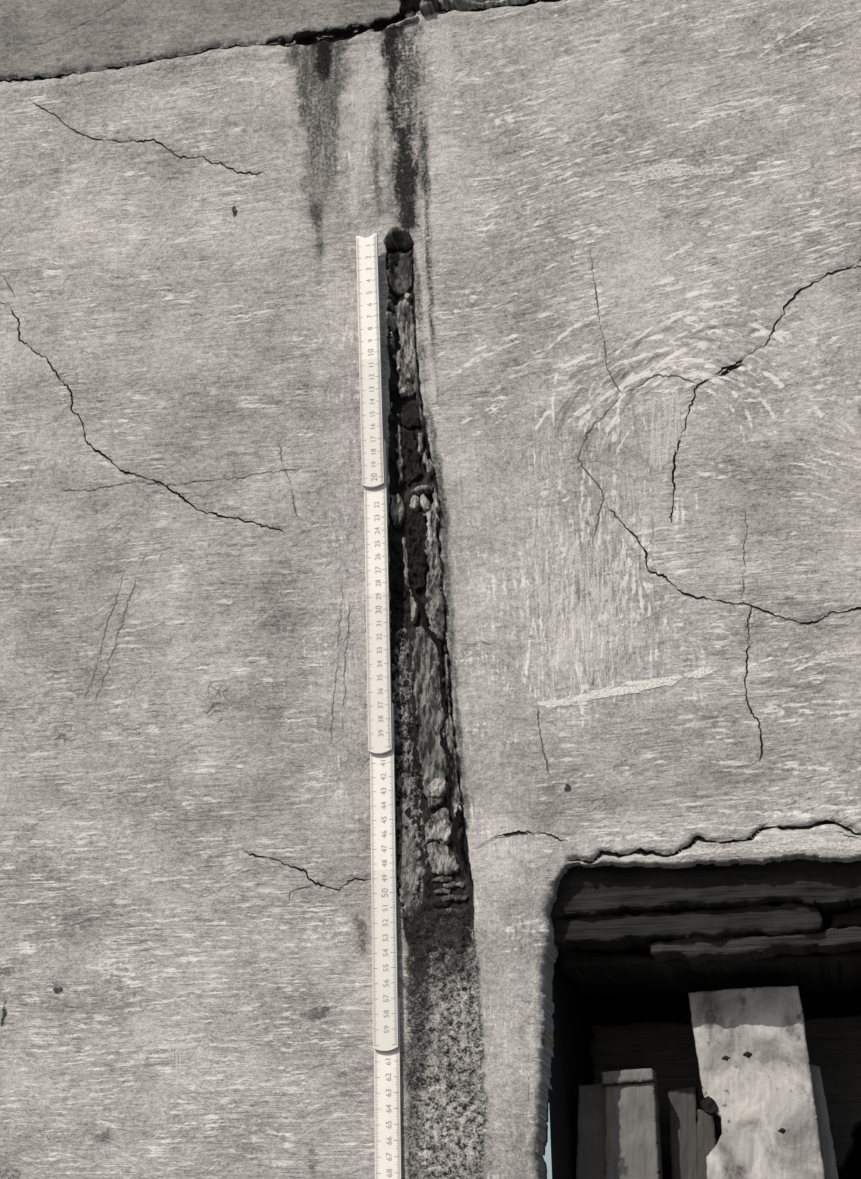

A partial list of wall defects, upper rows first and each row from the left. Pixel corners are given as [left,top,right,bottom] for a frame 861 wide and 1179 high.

crack [0,0,561,175]
leakage [285,21,454,345]
crack [0,274,300,532]
crack [577,253,861,761]
crack [242,850,367,895]
crack [411,583,861,877]